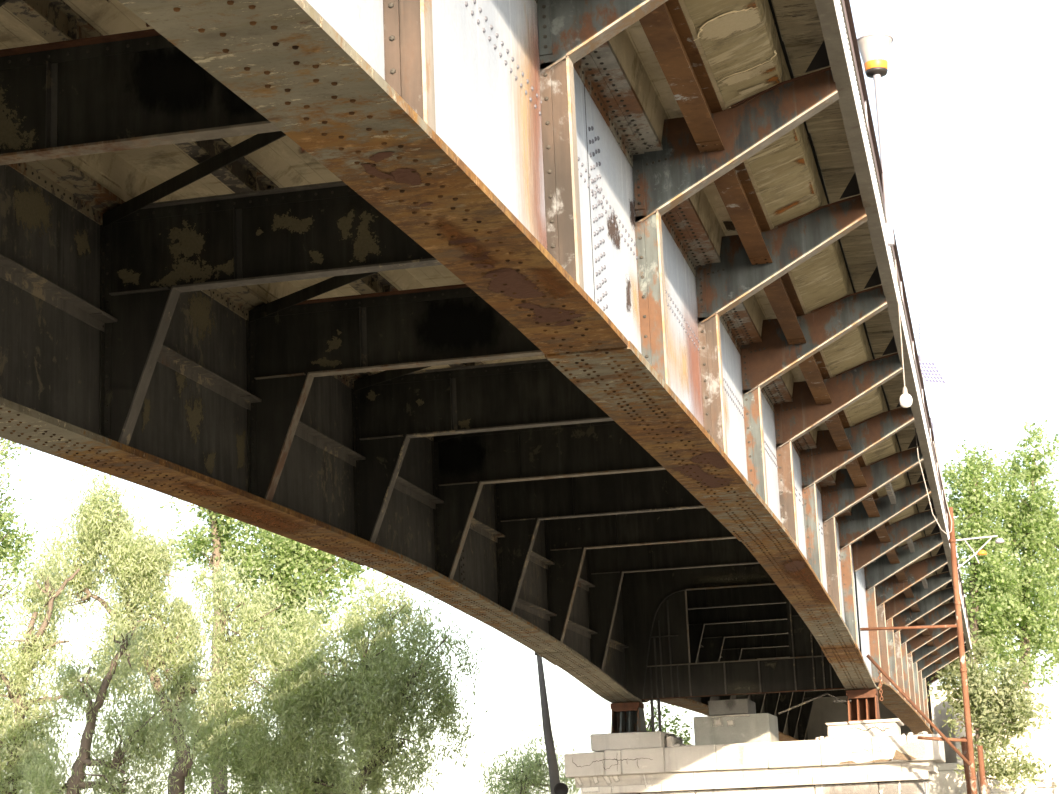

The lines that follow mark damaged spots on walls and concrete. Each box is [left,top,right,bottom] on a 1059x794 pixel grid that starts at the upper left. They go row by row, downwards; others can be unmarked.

leakage [132,48,254,115]
peeling [0,85,39,159]
rust [520,38,547,250]
peeling [117,219,234,291]
peeling [256,209,315,236]
peeling [336,204,386,263]
rust [668,328,703,417]
rust [184,483,299,532]
rust [783,558,831,603]
crack [572,757,653,770]